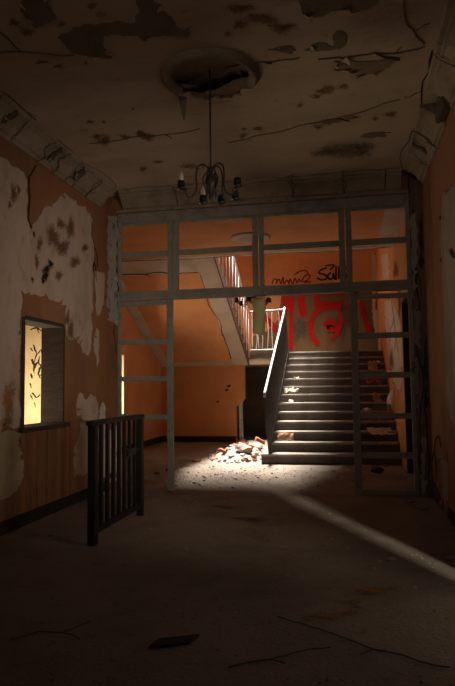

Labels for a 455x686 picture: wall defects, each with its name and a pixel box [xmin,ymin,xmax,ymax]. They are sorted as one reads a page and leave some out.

peeling [57,0,192,60]
crack [225,0,455,143]
peeling [332,57,400,79]
crack [90,128,200,144]
peeling [0,157,167,432]
peeling [73,392,117,482]